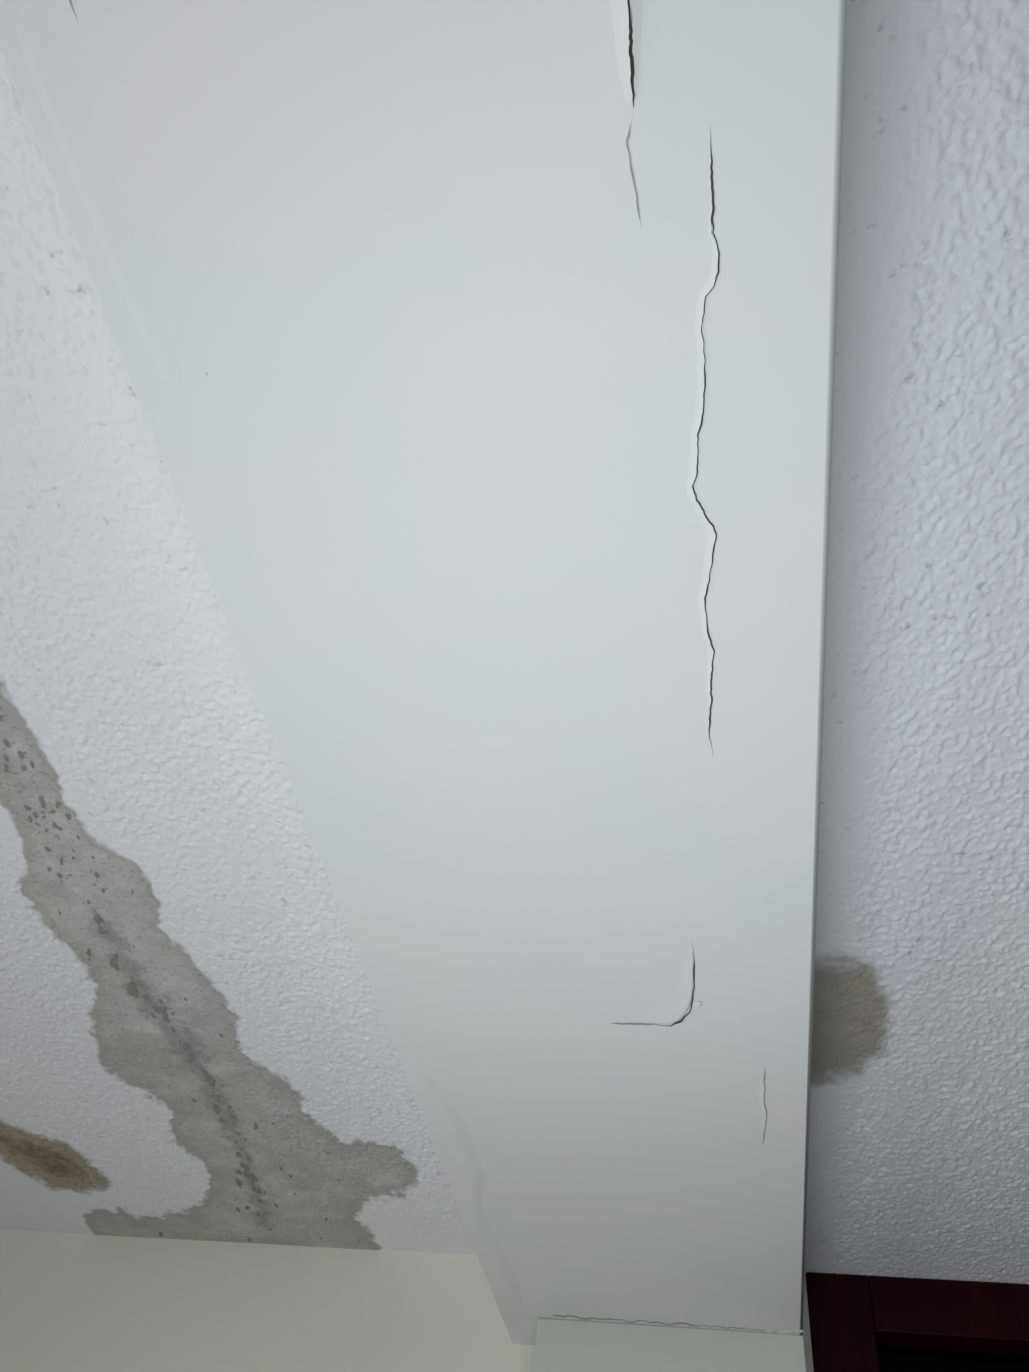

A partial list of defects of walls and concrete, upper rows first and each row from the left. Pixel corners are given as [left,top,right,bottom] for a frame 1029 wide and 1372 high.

peeling [610,0,642,223]
crack [686,130,720,753]
leakage [0,684,417,1250]
crack [612,944,695,1026]
leakage [811,966,886,1083]